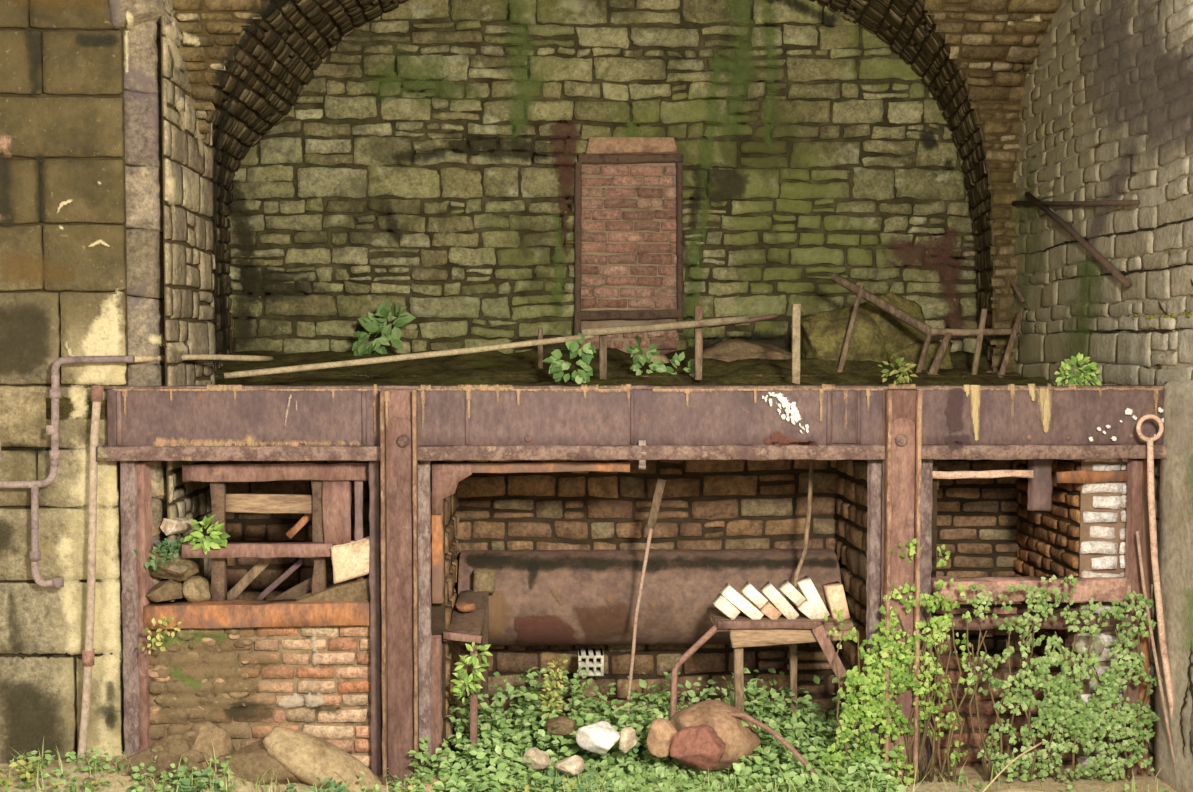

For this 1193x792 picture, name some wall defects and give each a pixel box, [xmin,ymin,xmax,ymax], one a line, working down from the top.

crack [1015,217,1193,256]
crack [1051,264,1193,334]
rust [113,375,630,435]
peeling [762,391,809,433]
rust [645,375,1038,420]
rust [1052,379,1163,414]
rust [154,436,352,448]
rust [764,431,819,447]
crack [1180,644,1193,758]